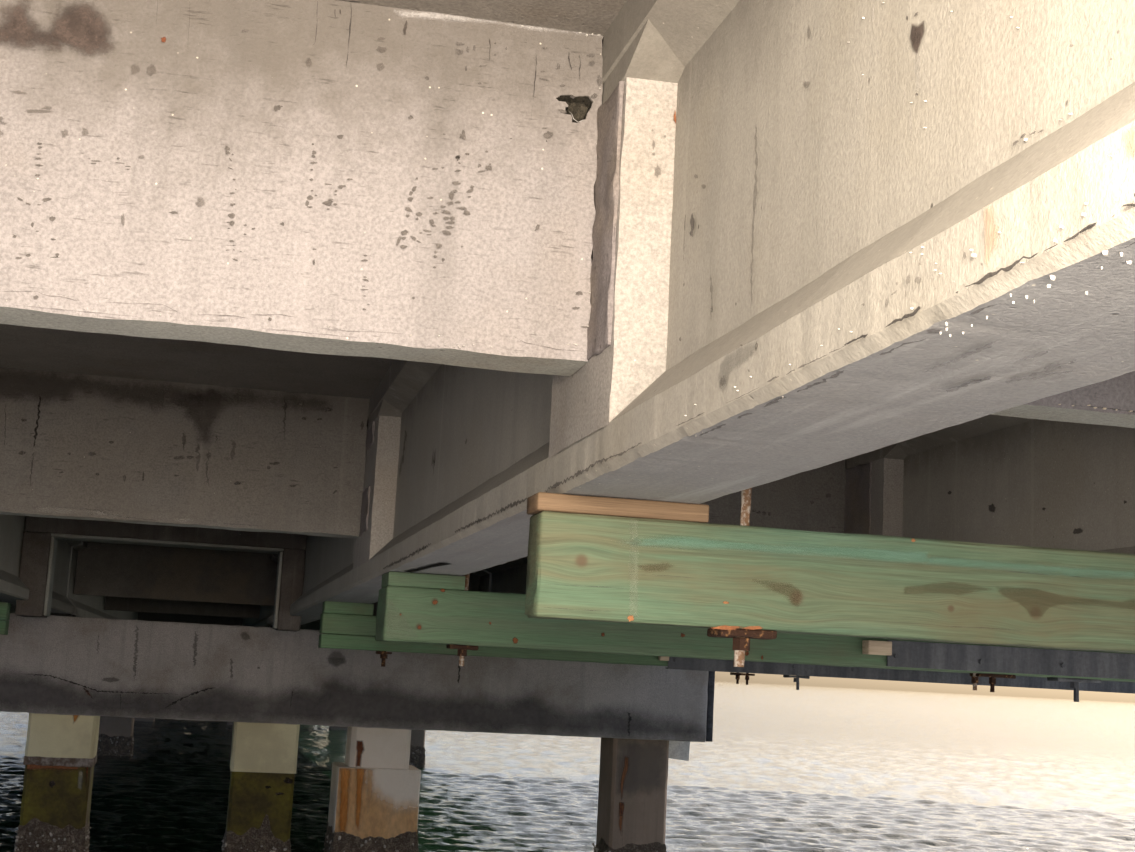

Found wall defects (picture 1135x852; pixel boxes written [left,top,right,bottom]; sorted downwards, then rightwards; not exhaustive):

water stain [0,4,111,54]
spalling [540,53,603,123]
crack [956,193,1135,314]
crack [679,306,940,435]
crack [383,443,640,569]
water stain [0,674,698,736]
corrosion [335,741,418,839]